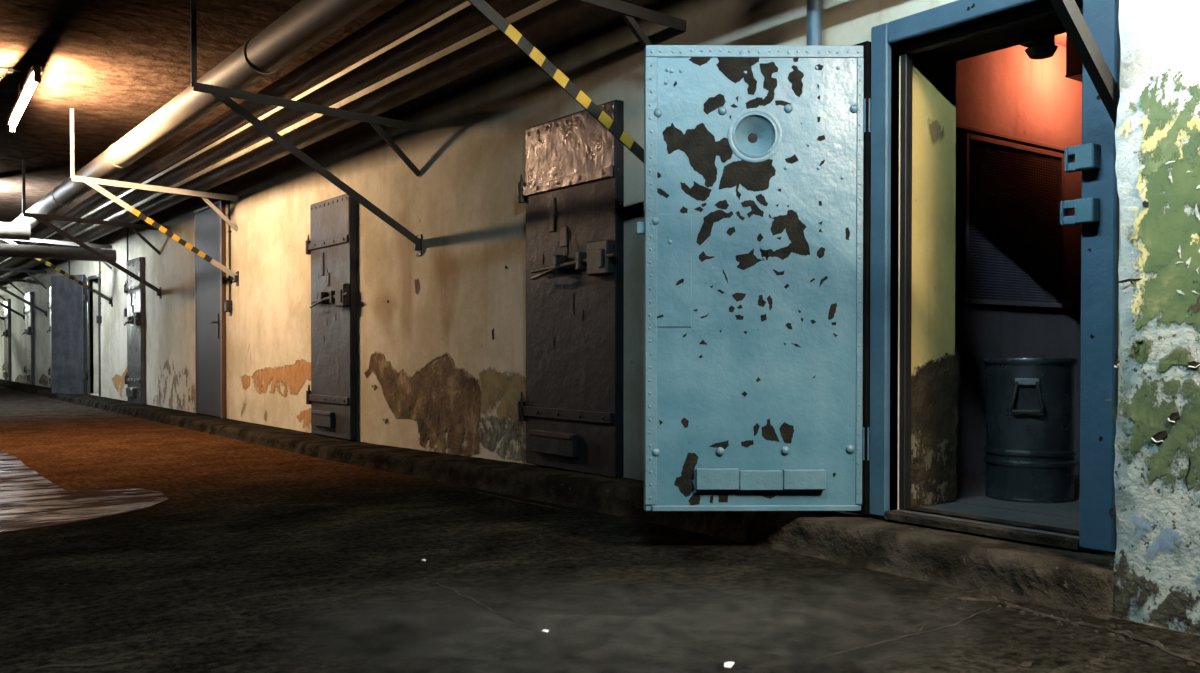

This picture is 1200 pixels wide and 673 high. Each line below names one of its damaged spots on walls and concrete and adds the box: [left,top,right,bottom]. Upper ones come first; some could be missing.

peeling [657,57,825,334]
peeling [783,303,838,348]
peeling [1099,68,1200,501]
flaking render [241,359,311,414]
flaking render [296,408,311,428]
flaking render [364,351,526,463]
flaking render [1108,549,1200,636]